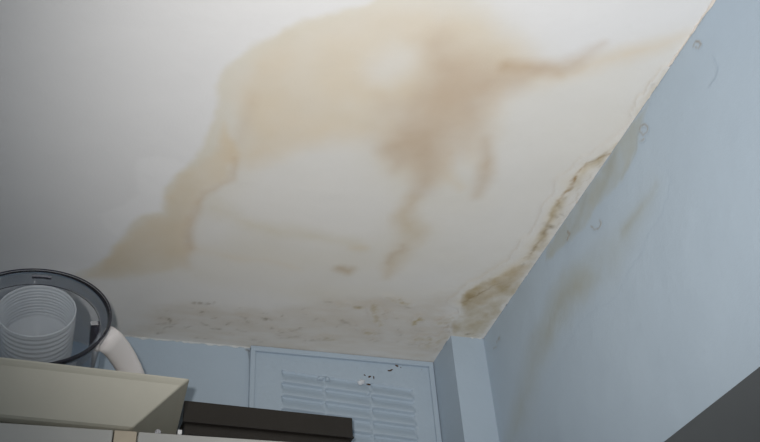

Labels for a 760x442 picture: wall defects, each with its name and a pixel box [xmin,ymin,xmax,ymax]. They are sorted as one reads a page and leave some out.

water stain [66,0,706,362]
water stain [500,161,671,442]